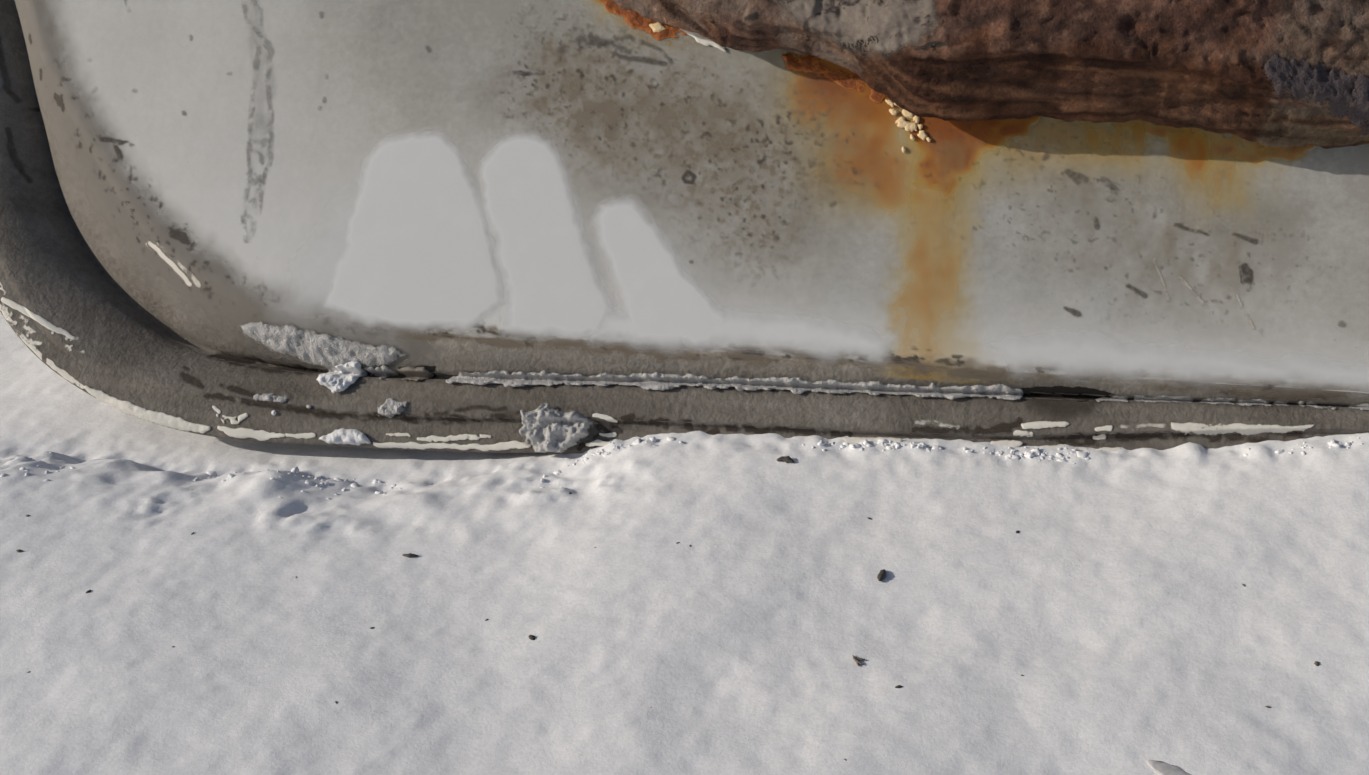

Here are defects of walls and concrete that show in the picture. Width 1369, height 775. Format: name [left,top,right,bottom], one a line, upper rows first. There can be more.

rust [594,0,688,43]
rust [782,53,1315,378]
spalling [0,282,316,441]
spalling [373,432,531,451]
spalling [586,413,618,447]
spalling [990,421,1315,451]